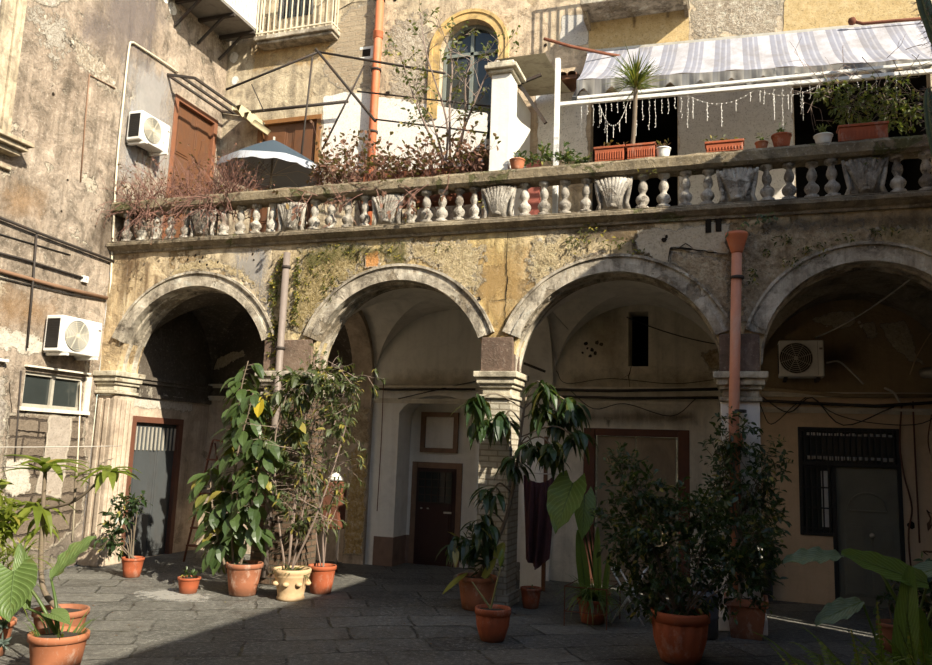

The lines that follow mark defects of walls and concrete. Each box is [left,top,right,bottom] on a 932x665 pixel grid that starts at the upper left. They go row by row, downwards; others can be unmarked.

damp [236,252,267,285]
crack [489,233,508,327]
flaking render [524,228,587,285]
flaking render [670,217,932,326]